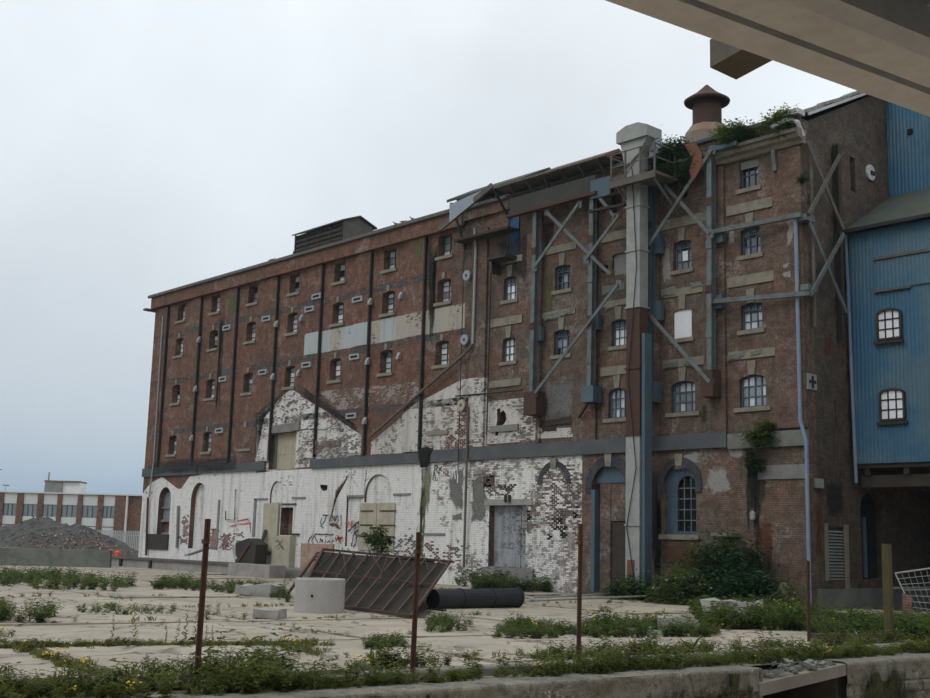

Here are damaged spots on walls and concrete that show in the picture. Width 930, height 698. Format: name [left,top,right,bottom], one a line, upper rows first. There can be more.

peeling [275,395,302,425]
peeling [299,414,359,459]
spalling [418,447,433,468]
peeling [446,402,469,449]
spalling [443,462,516,521]
peeling [502,454,604,568]